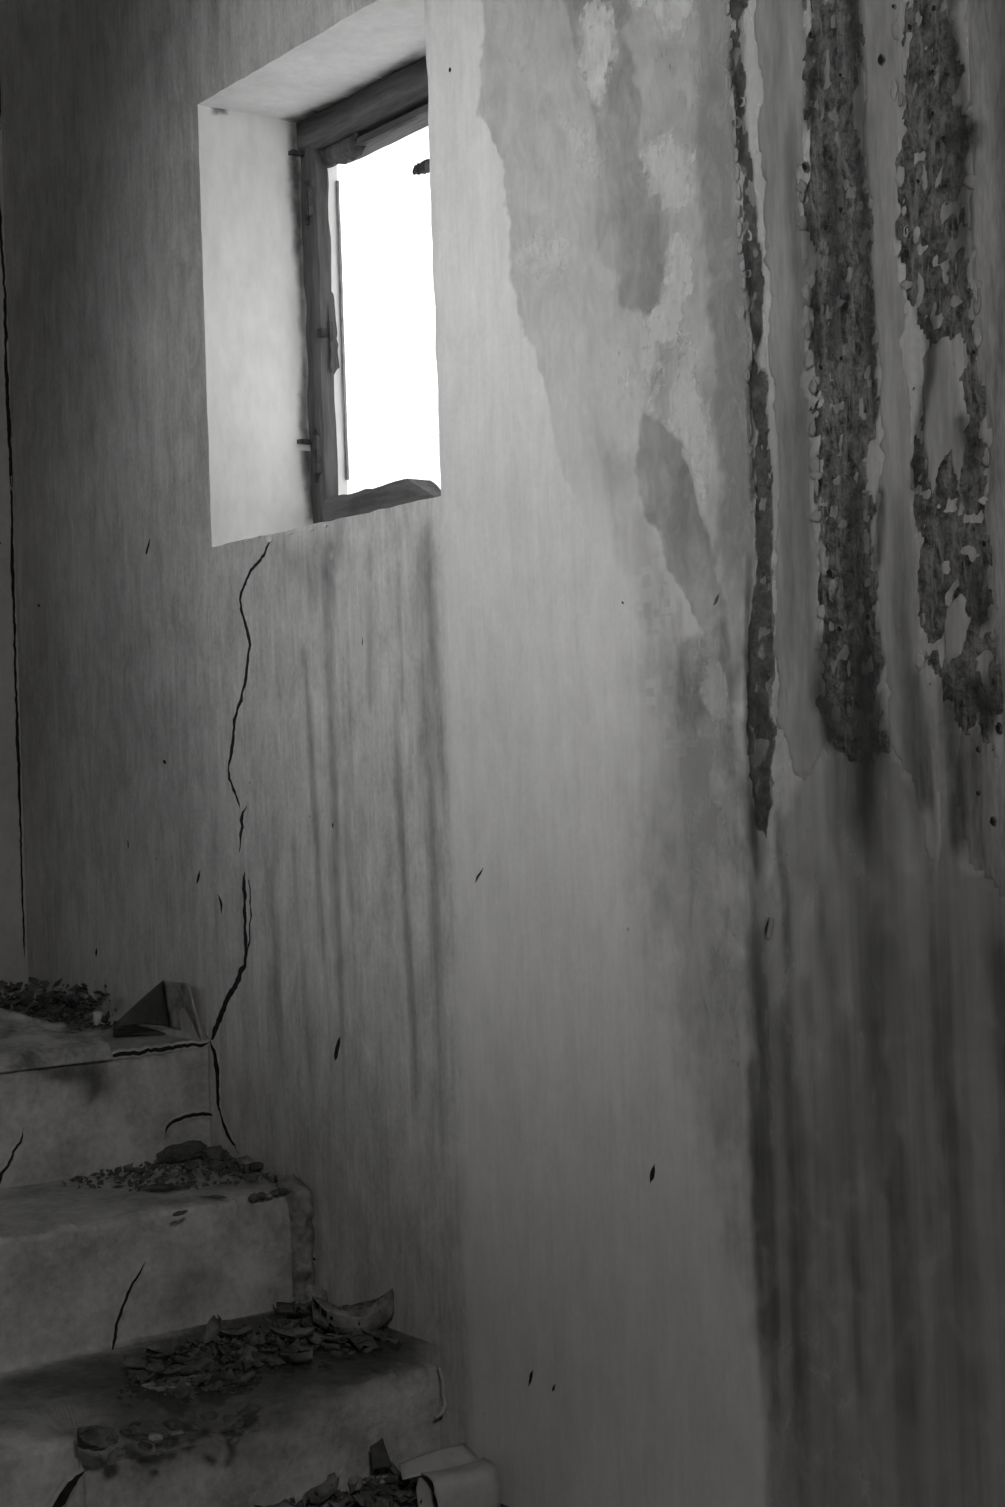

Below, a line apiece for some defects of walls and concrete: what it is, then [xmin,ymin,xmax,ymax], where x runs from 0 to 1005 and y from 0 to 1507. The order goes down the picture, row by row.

peeling [724,0,1005,896]
crack [107,542,271,1153]
crack [0,1127,25,1187]
crack [109,1260,147,1350]
crack [48,1469,86,1507]